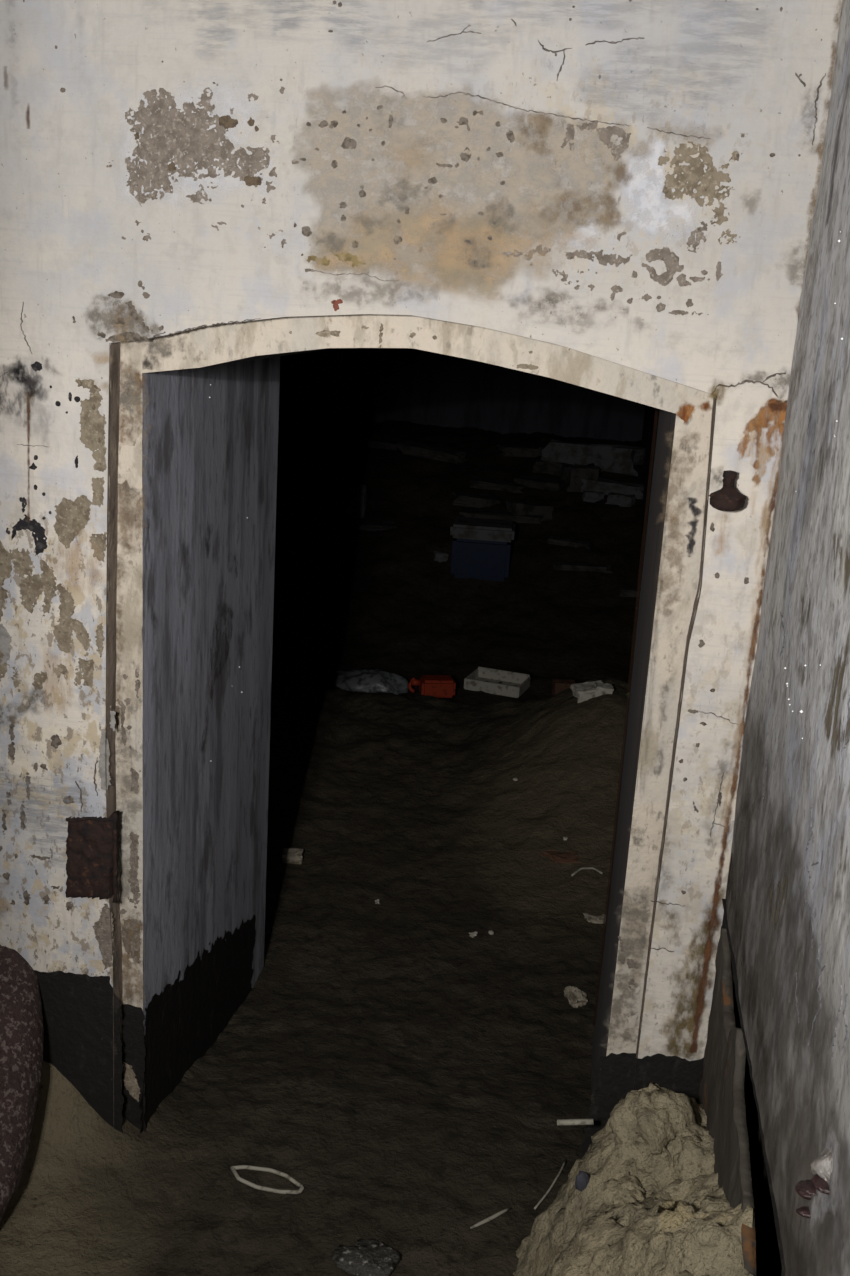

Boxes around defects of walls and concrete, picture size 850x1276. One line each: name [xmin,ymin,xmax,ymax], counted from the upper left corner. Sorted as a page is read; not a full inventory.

peeling [106,82,279,241]
spalling [424,110,515,198]
peeling [561,121,631,161]
spalling [258,222,312,248]
peeling [501,138,742,316]
spalling [97,280,164,342]
damp [2,361,43,412]
corrosion [738,399,787,546]
peeling [0,379,107,692]
spalling [8,717,16,760]
spalling [0,763,50,860]
corrosion [690,569,765,1053]